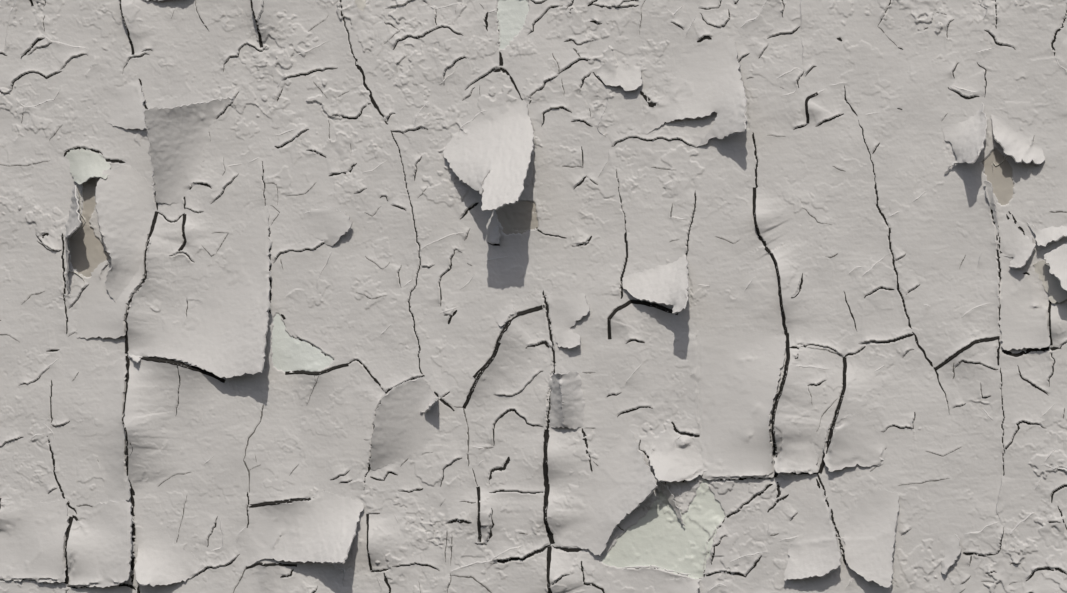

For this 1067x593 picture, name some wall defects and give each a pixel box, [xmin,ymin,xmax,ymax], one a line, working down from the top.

crack [0,233,77,352]
crack [3,125,125,166]
peeling [0,81,380,593]
crack [262,0,606,593]
peeling [443,59,643,246]
peeling [622,255,689,314]
peeling [614,0,800,148]
peeling [943,63,1067,396]
crack [47,372,93,589]
crack [243,404,314,528]
peeling [553,330,916,593]
crack [233,562,297,593]